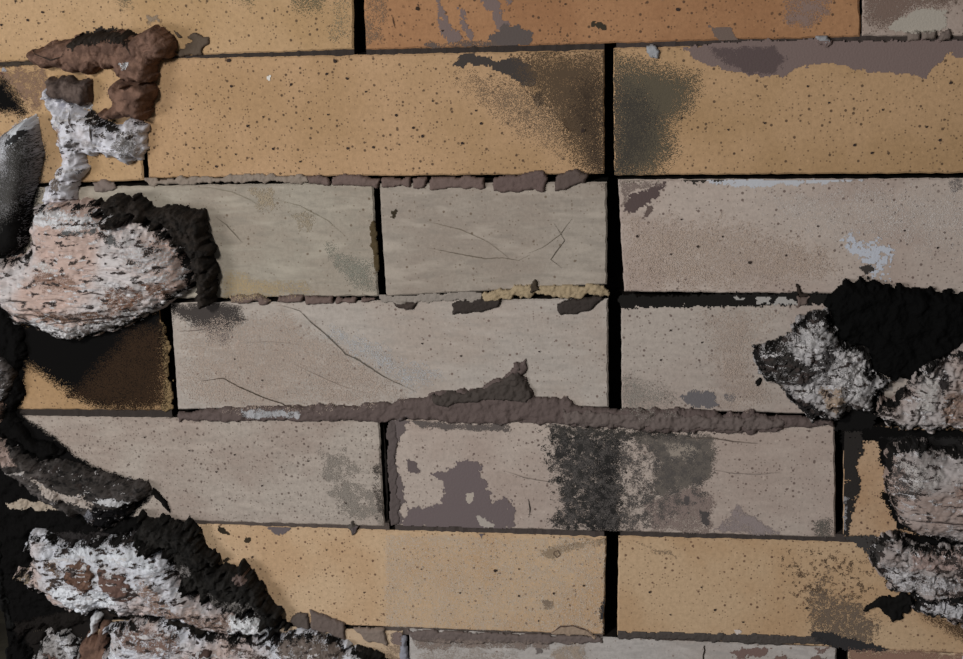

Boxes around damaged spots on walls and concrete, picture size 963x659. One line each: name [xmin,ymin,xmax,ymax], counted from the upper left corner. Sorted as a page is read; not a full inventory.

spalling [476,515,494,538]
damp [881,562,963,619]